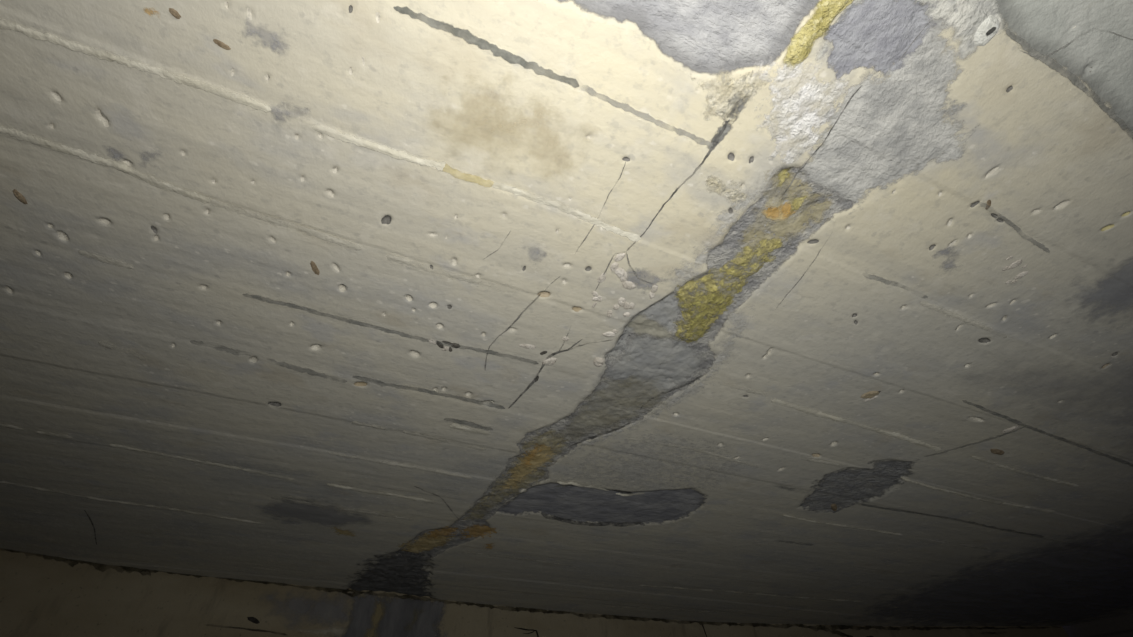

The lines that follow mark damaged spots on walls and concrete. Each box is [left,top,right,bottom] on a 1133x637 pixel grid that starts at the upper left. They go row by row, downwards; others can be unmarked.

peeling [558,0,819,75]
peeling [789,0,1133,212]
crack [595,70,753,291]
peeling [613,267,636,317]
leakage [1086,261,1133,317]
spalling [428,323,460,352]
crack [509,335,609,408]
spalling [800,461,913,513]
leakage [308,551,444,637]